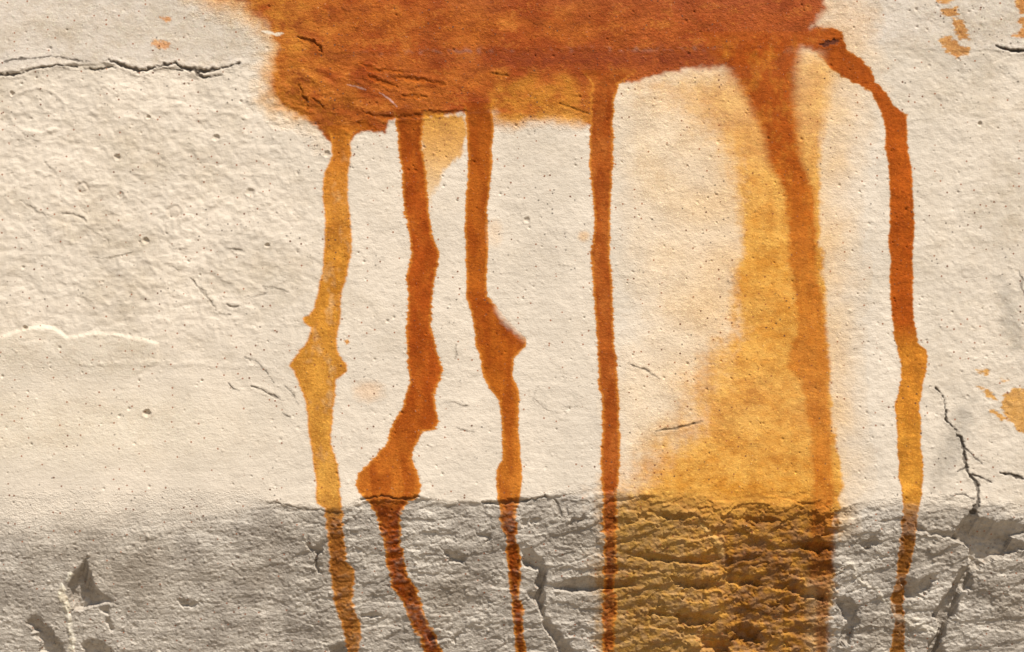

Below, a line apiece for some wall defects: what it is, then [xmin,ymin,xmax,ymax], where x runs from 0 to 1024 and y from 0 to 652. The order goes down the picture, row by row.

crack [0,54,241,80]
corrosion [934,0,972,60]
corrosion [158,0,929,652]
crack [934,386,1024,516]
corrosion [974,368,1024,434]
spalling [0,487,346,652]
spalling [343,483,598,652]
spalling [830,492,1024,652]